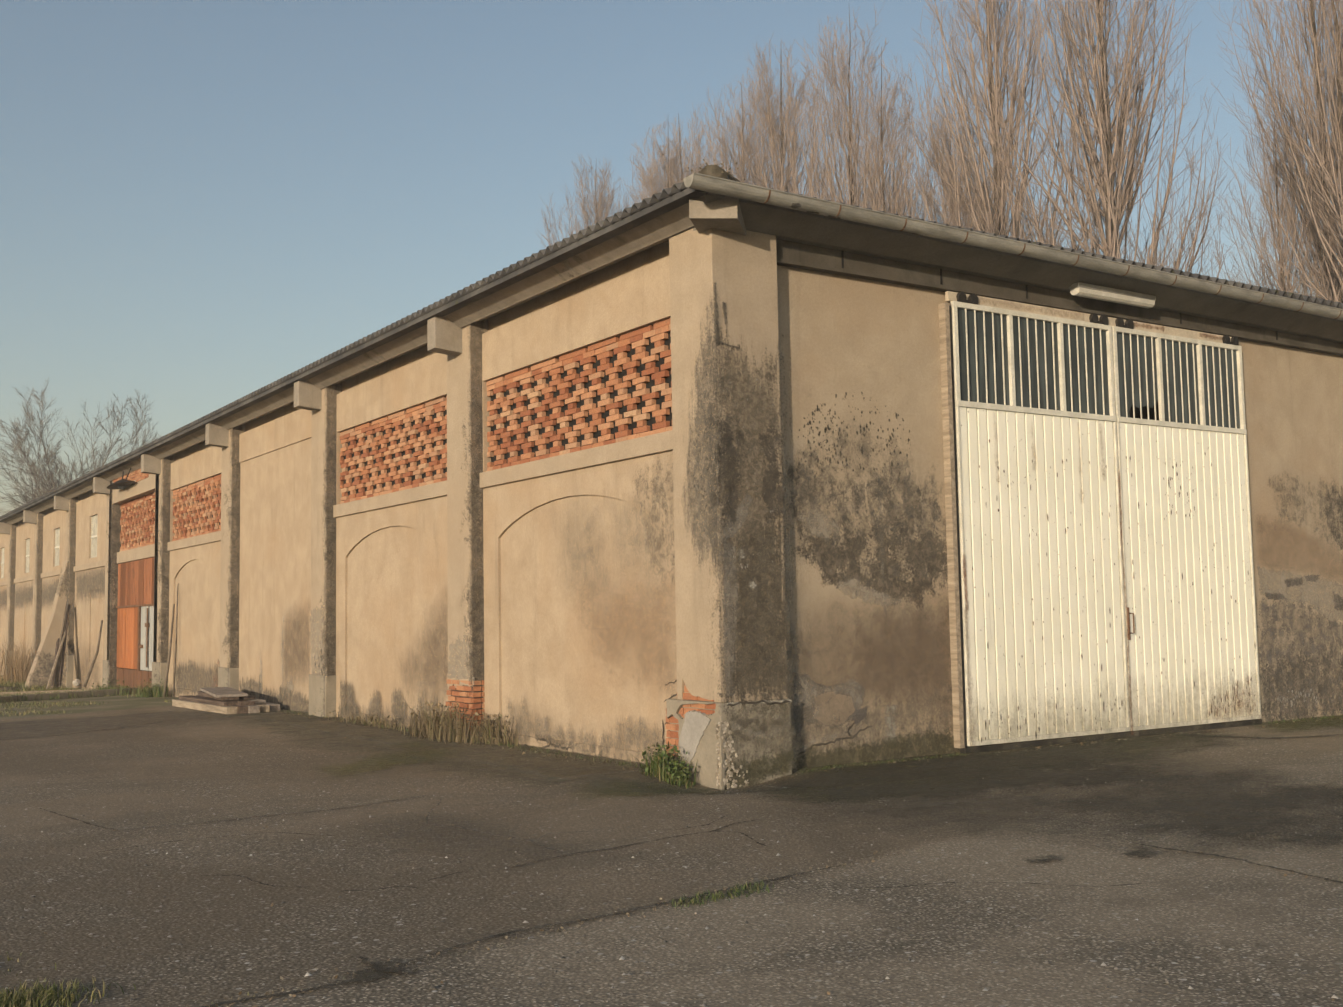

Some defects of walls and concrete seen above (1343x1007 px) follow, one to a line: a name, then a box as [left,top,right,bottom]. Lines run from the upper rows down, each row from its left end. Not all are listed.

flaking render [446,636,485,739]
peeling [666,464,767,790]
leakage [641,283,1343,854]